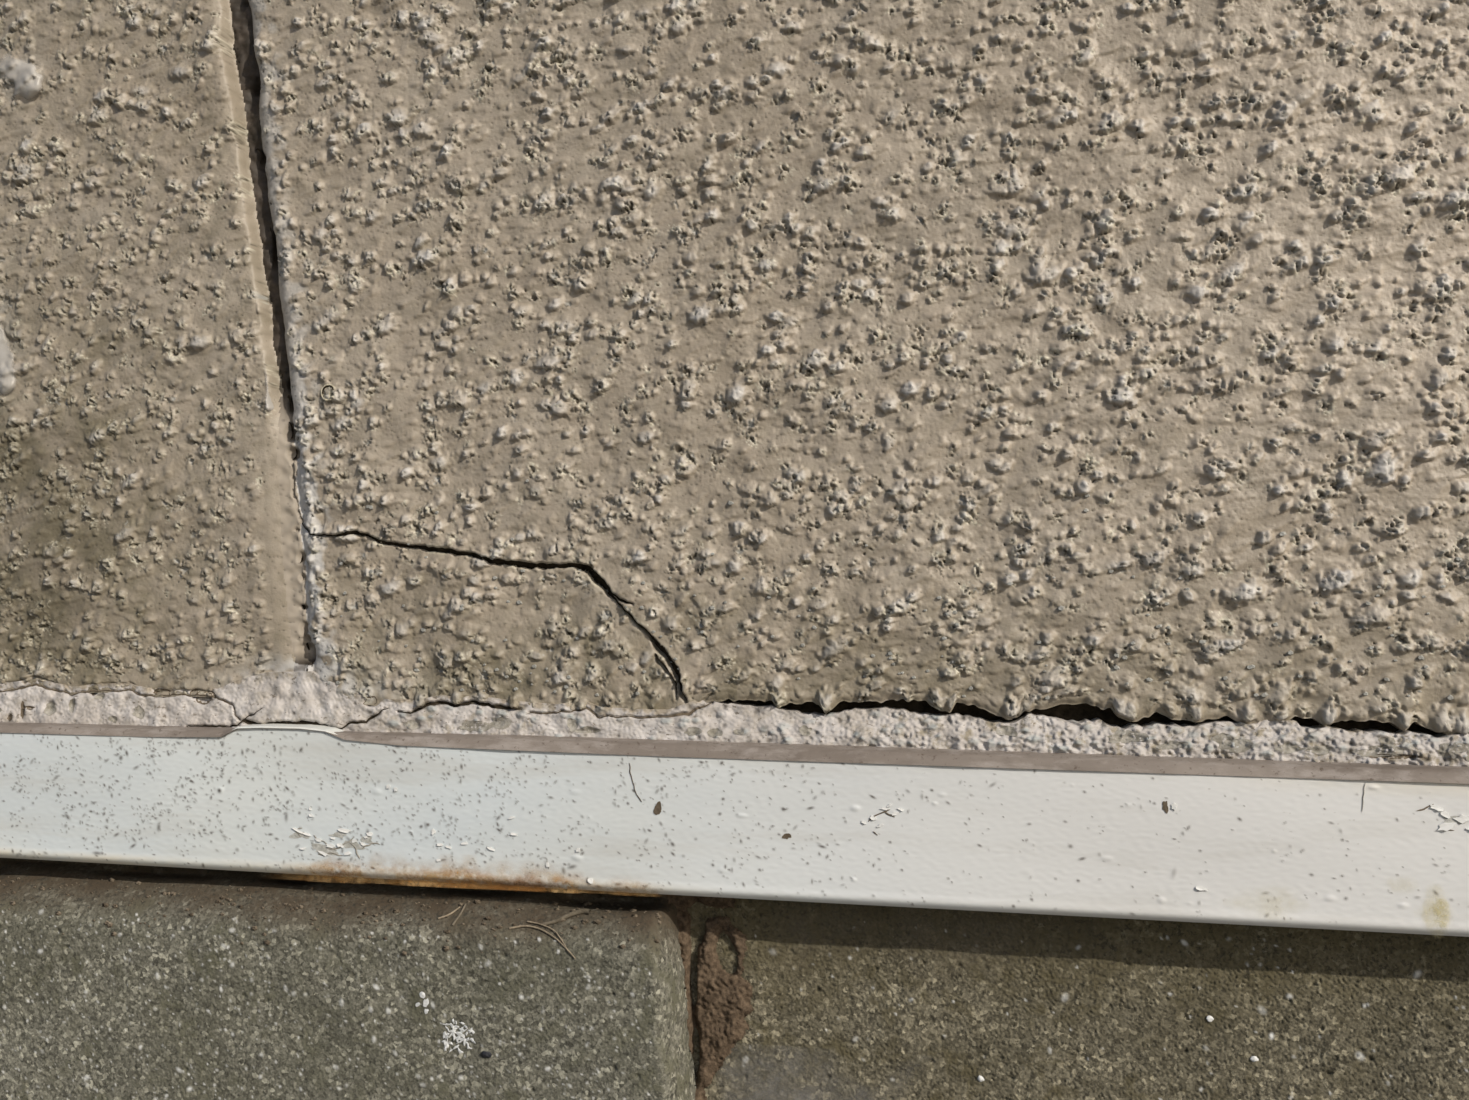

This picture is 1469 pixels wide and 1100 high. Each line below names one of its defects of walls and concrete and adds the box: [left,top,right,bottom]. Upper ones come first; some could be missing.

crack [0,523,713,729]
peeling [1417,804,1469,831]
corrosion [408,872,576,893]